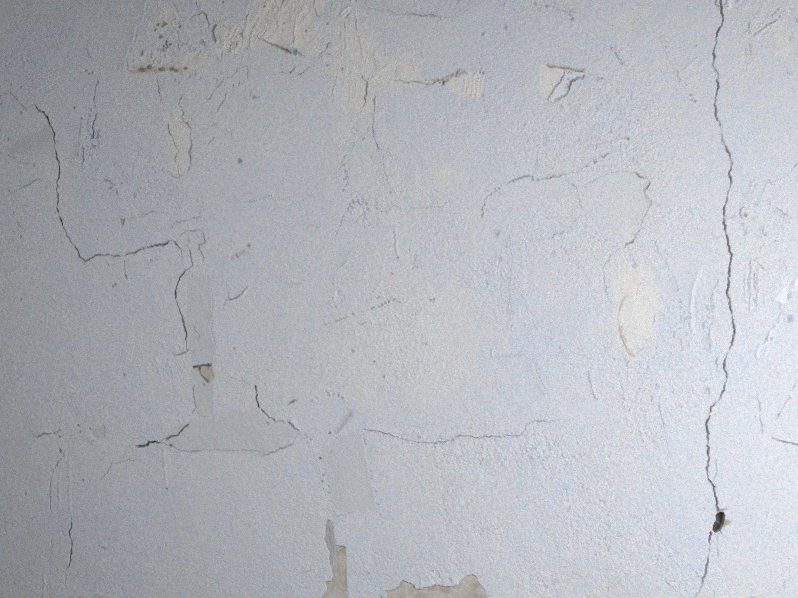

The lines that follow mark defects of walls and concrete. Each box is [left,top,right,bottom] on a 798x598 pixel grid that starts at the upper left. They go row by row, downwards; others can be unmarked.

peeling [122,0,337,77]
peeling [391,70,487,102]
peeling [539,63,588,119]
crack [0,84,209,356]
crack [705,0,737,512]
crack [616,238,683,359]
crack [97,382,217,491]
crack [229,376,322,460]
crack [360,418,572,456]
peeling [321,519,349,598]
peeling [376,575,489,598]
crack [693,531,723,598]